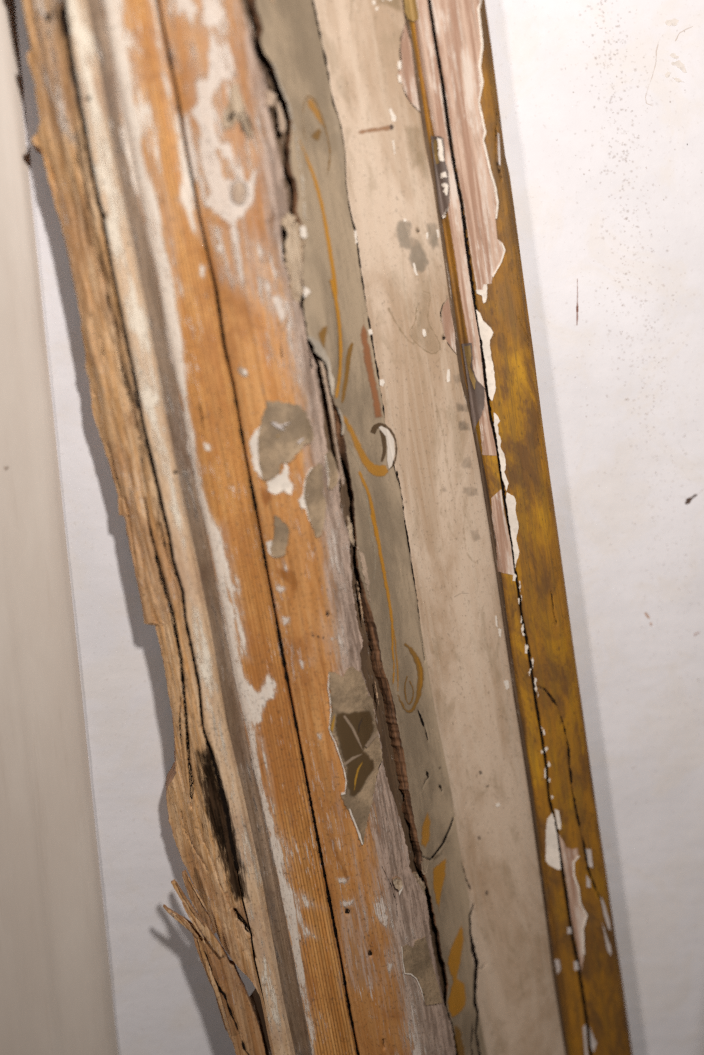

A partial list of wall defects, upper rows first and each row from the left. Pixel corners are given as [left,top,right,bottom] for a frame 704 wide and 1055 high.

crack [45,0,239,869]
crack [156,0,385,1055]
peeling [266,515,290,558]
peeling [249,336,344,538]
crack [393,459,425,661]
peeling [397,0,539,698]
peeling [327,666,383,845]
crack [422,817,454,860]
peeling [541,726,611,975]
peeling [583,1024,597,1055]